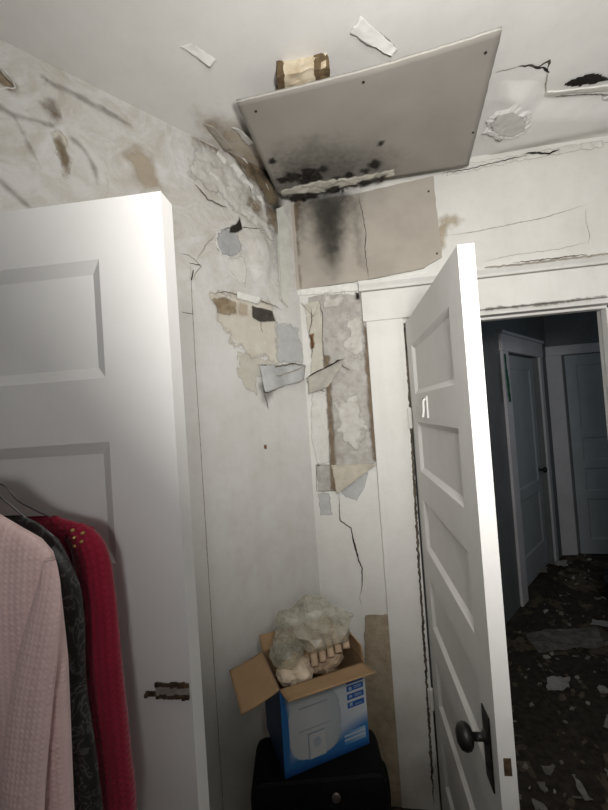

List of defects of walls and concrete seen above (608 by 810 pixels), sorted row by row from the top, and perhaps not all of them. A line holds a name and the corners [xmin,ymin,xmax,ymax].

peeling [482,103,533,142]
water stain [209,123,386,231]
spalling [188,124,376,515]
crack [339,501,363,606]